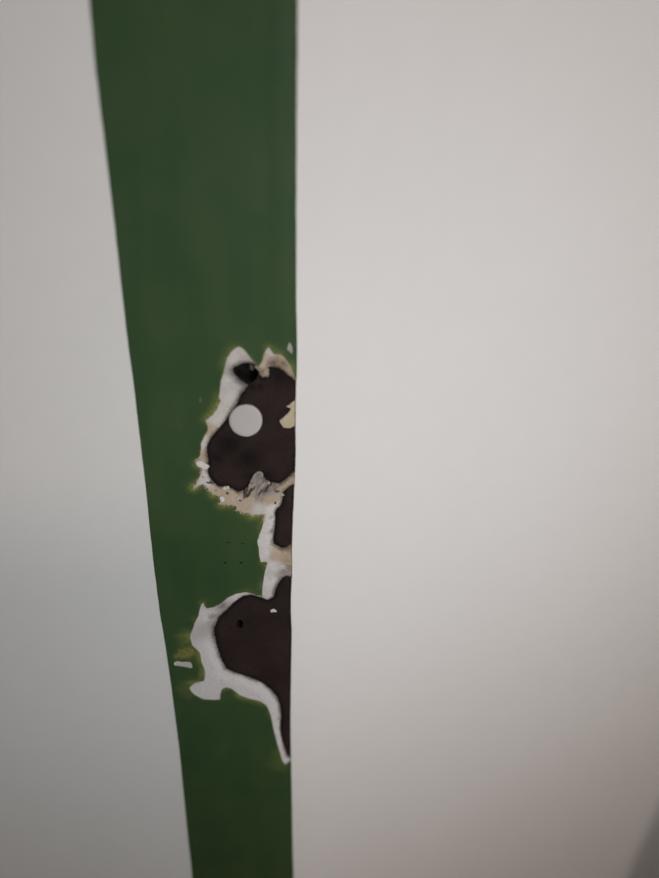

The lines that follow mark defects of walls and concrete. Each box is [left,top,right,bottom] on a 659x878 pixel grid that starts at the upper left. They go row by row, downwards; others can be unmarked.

peeling [280,400,295,428]
peeling [175,647,201,680]